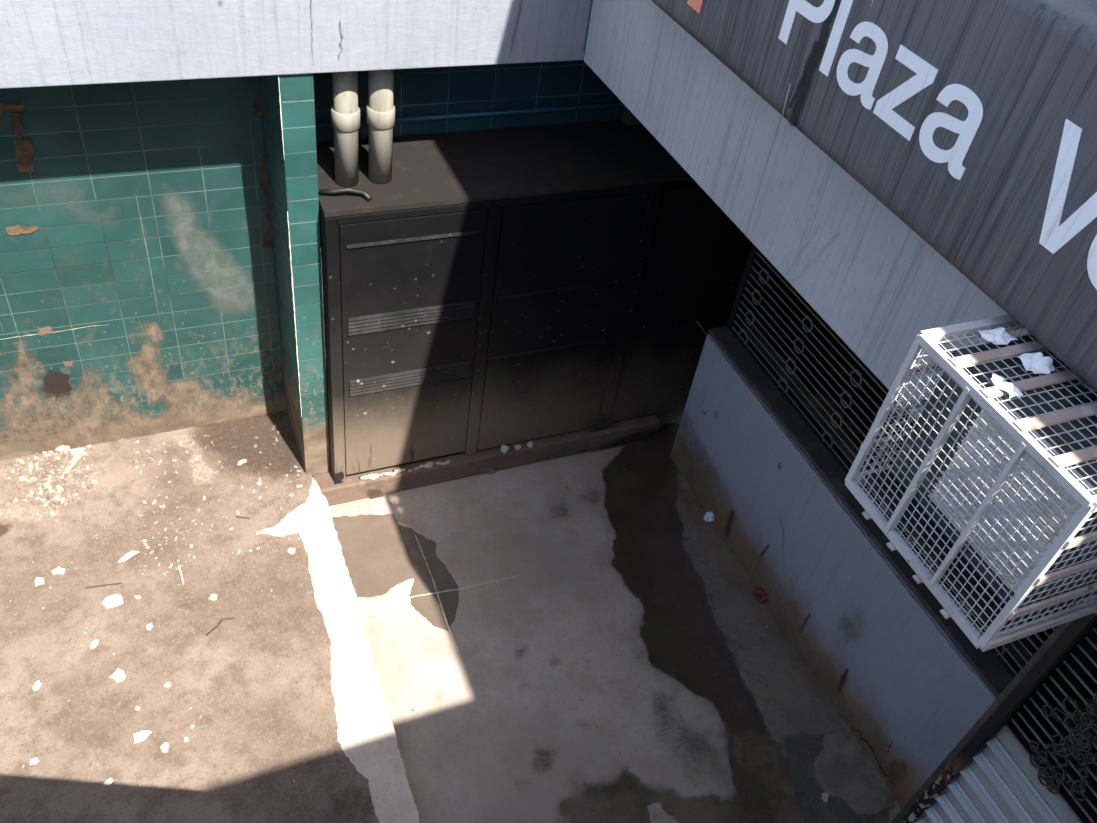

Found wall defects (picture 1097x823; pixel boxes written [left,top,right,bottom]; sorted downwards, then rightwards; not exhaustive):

leakage [782,0,840,126]
spalling [0,102,35,172]
spalling [5,225,38,235]
spalling [43,370,71,405]
leakage [129,322,297,485]
leakage [592,423,768,733]
leakage [647,802,679,823]
leakage [776,733,889,823]